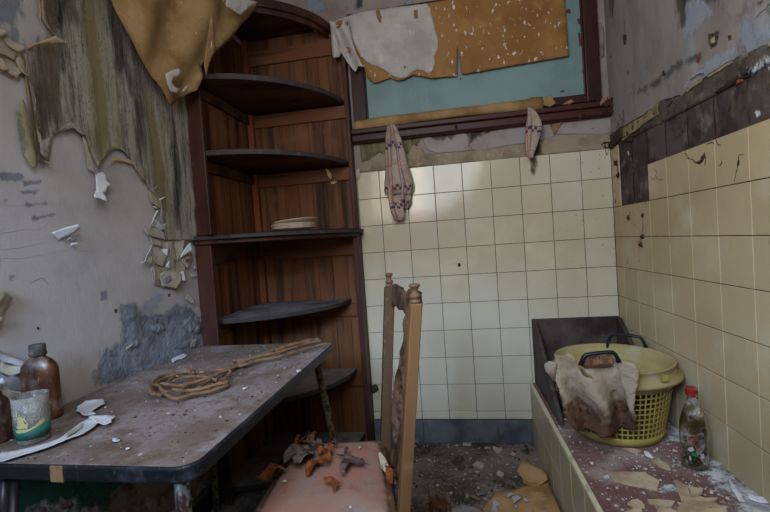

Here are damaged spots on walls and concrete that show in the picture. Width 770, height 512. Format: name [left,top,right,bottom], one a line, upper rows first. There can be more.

peeling [226,0,257,15]
peeling [0,27,29,80]
peeling [165,69,189,93]
peeling [407,0,770,206]
peeling [18,100,38,169]
peeling [356,152,385,180]
peeling [0,172,41,193]
peeling [94,172,111,201]
peeling [52,224,80,247]
peeling [141,186,198,297]
peeling [19,480,176,512]